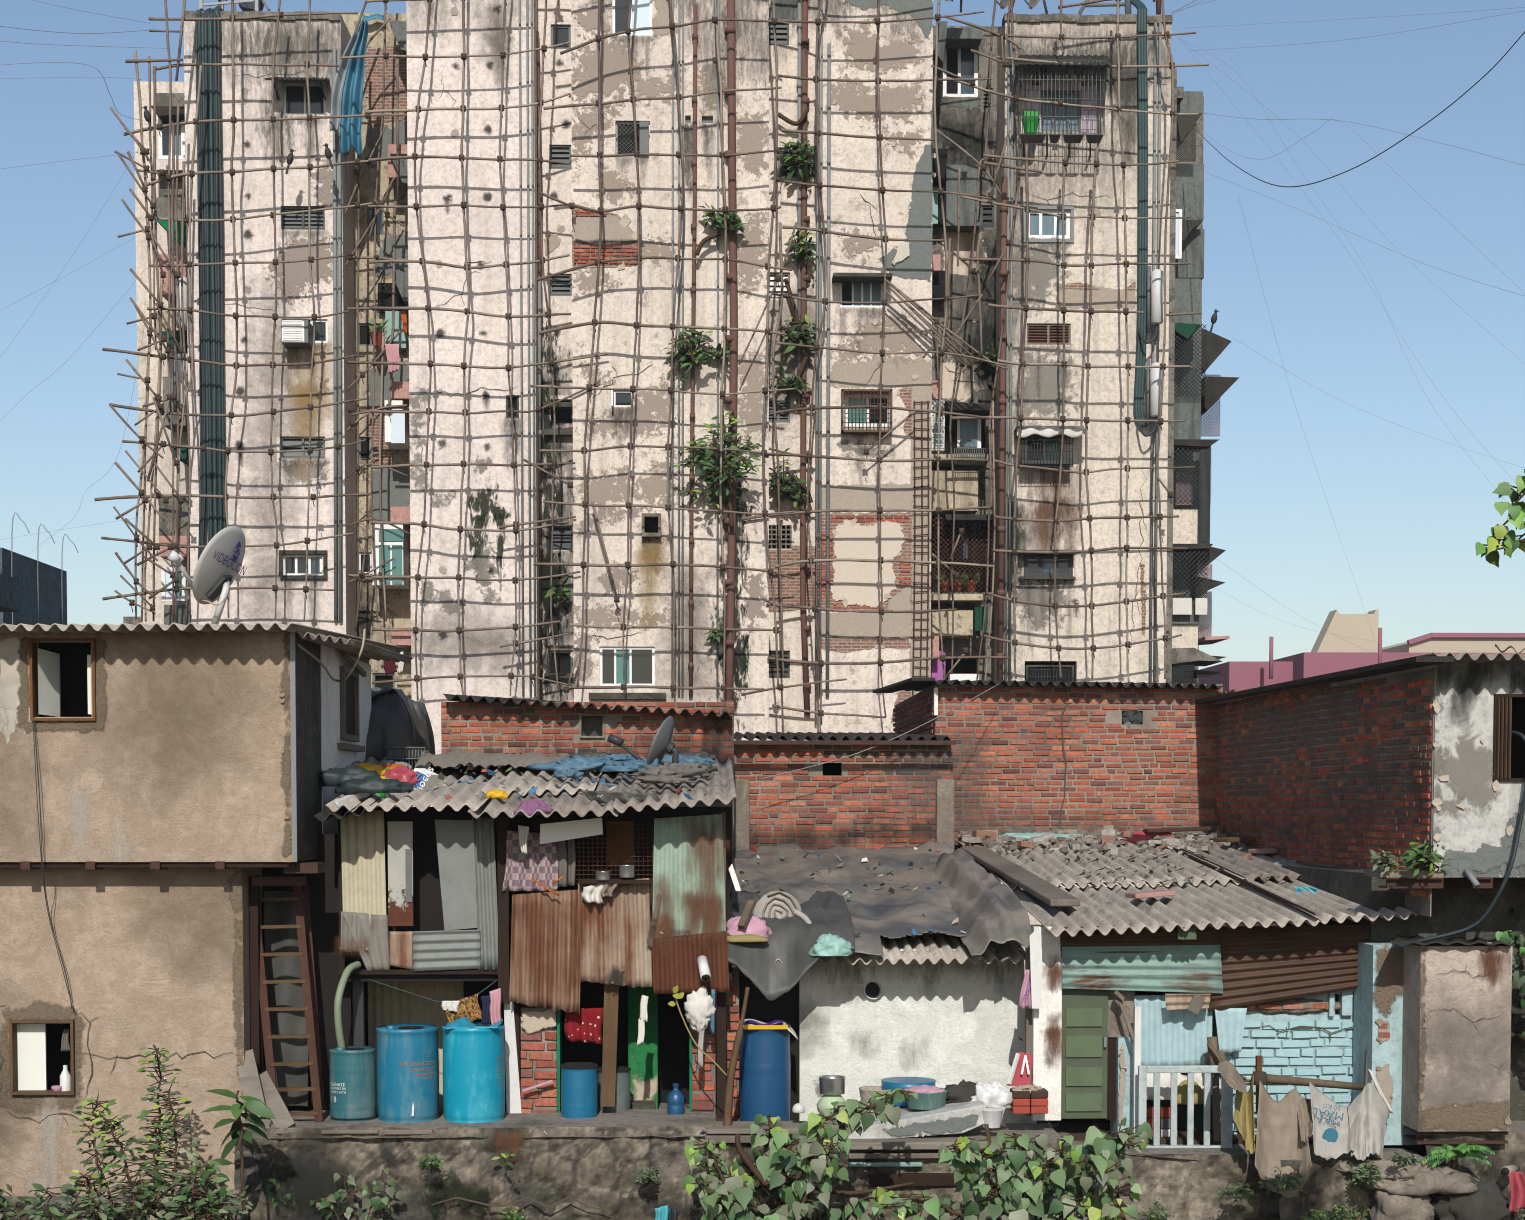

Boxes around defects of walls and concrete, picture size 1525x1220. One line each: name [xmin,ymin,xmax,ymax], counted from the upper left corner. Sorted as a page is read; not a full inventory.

peeling [824,15,936,178]
spalling [543,0,769,305]
peeling [838,227,897,268]
damp [466,514,507,591]
flaking render [739,509,913,653]
peeling [0,637,30,744]
peeling [1431,698,1500,842]
corrosion [687,824,721,934]
crack [0,1014,233,1125]